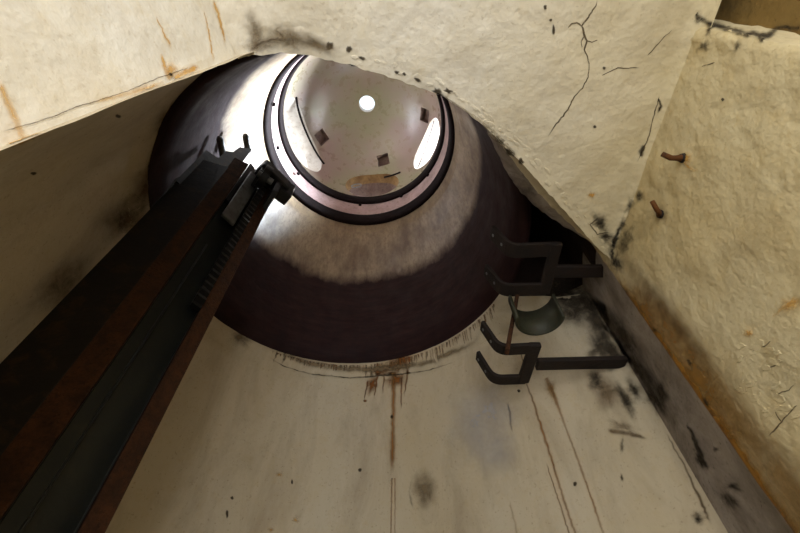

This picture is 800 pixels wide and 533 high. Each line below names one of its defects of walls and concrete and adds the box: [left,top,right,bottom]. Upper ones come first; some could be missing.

water stain [696,12,799,41]
rust [162,57,196,79]
crack [551,3,671,132]
crack [9,69,183,130]
crack [639,99,662,158]
water stain [590,217,632,268]
mould [550,278,635,356]
rust [304,354,427,463]
mould [591,357,667,415]
water stain [626,288,800,527]